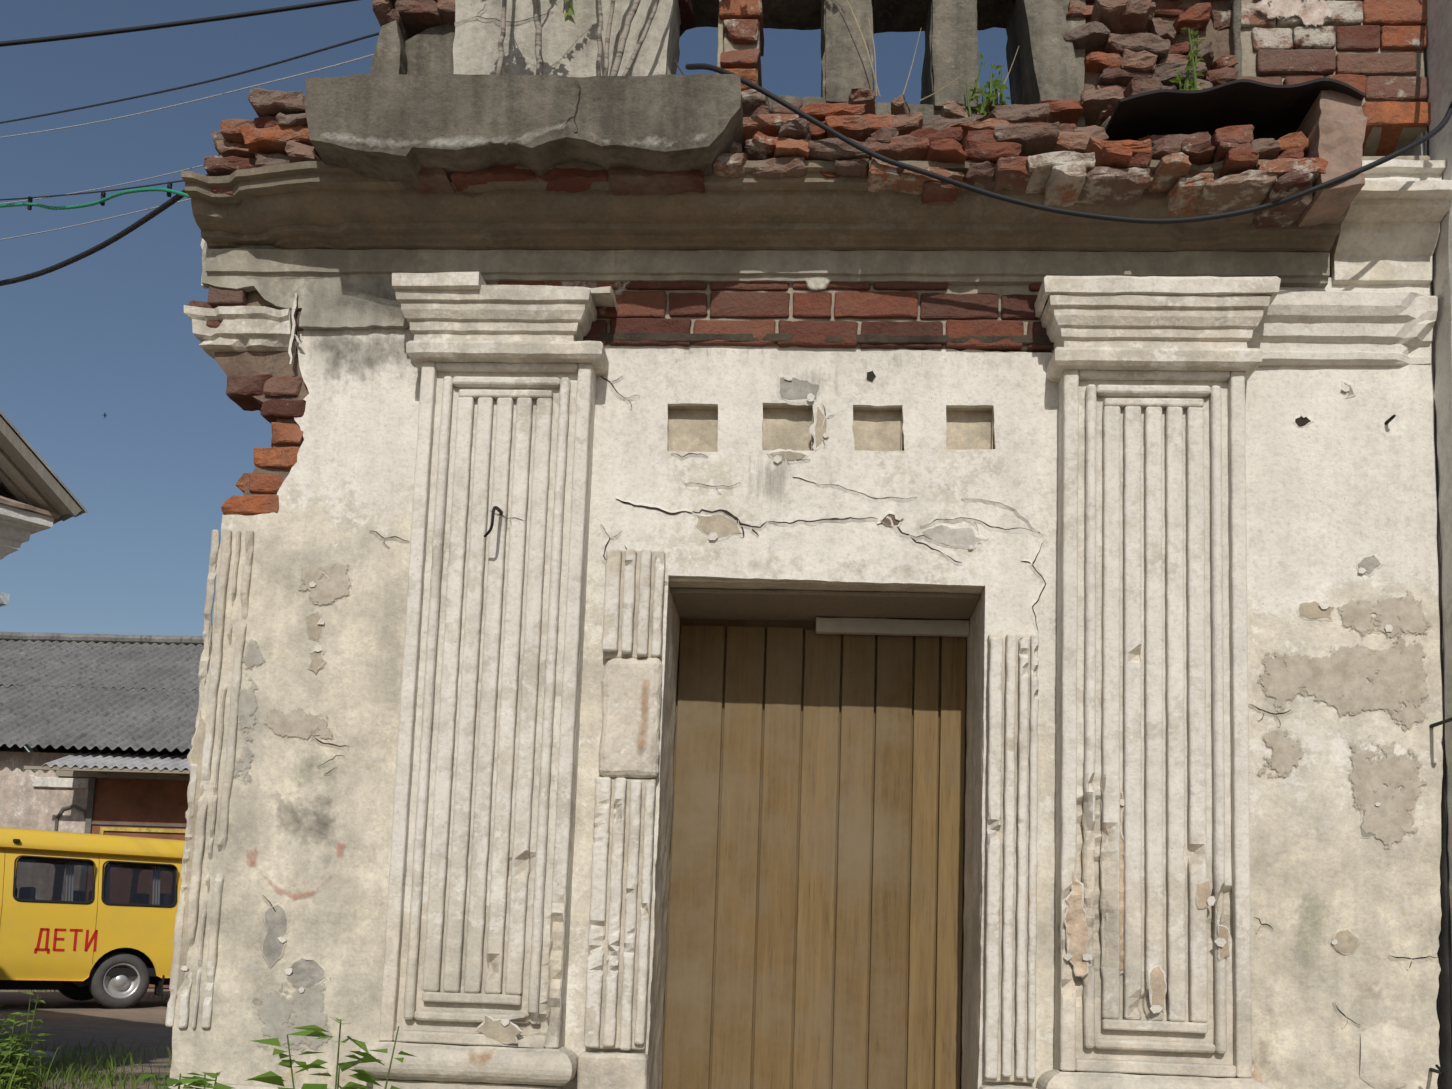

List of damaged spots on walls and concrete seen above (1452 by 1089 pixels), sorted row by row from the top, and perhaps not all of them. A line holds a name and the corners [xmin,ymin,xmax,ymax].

crack [600,403,1046,634]
flaking render [298,563,351,675]
flaking render [233,640,332,782]
flaking render [1257,590,1432,849]
flaking render [252,903,332,1052]
spalling [1064,871,1092,977]
spalling [1101,791,1124,975]
spalling [1148,965,1167,1013]
spalling [1195,880,1216,910]
spalling [1214,925,1230,962]